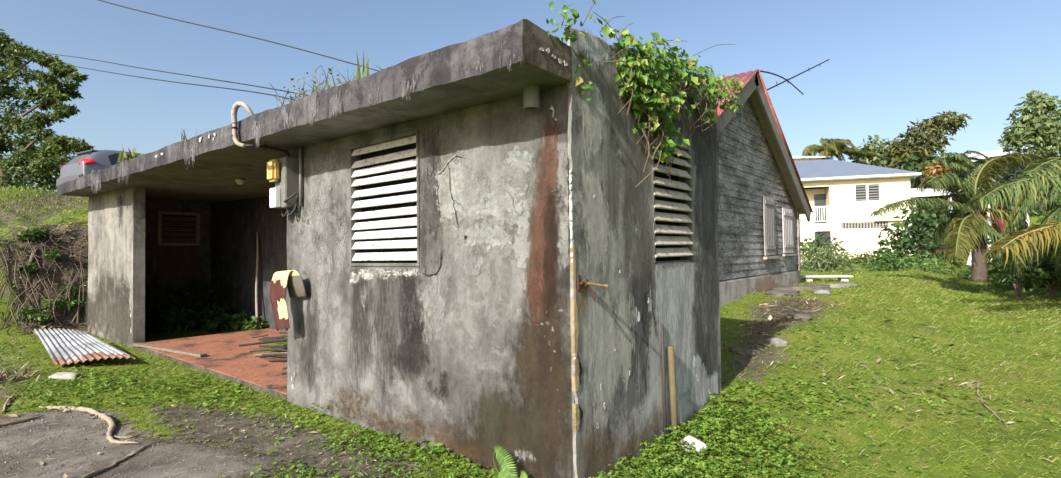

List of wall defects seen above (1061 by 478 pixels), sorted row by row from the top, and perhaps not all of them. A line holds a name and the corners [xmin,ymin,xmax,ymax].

damp [282,91,342,127]
crack [436,156,464,226]
peeling [417,144,537,345]
damp [452,153,573,478]
corrosion [528,116,561,324]
damp [578,42,722,399]